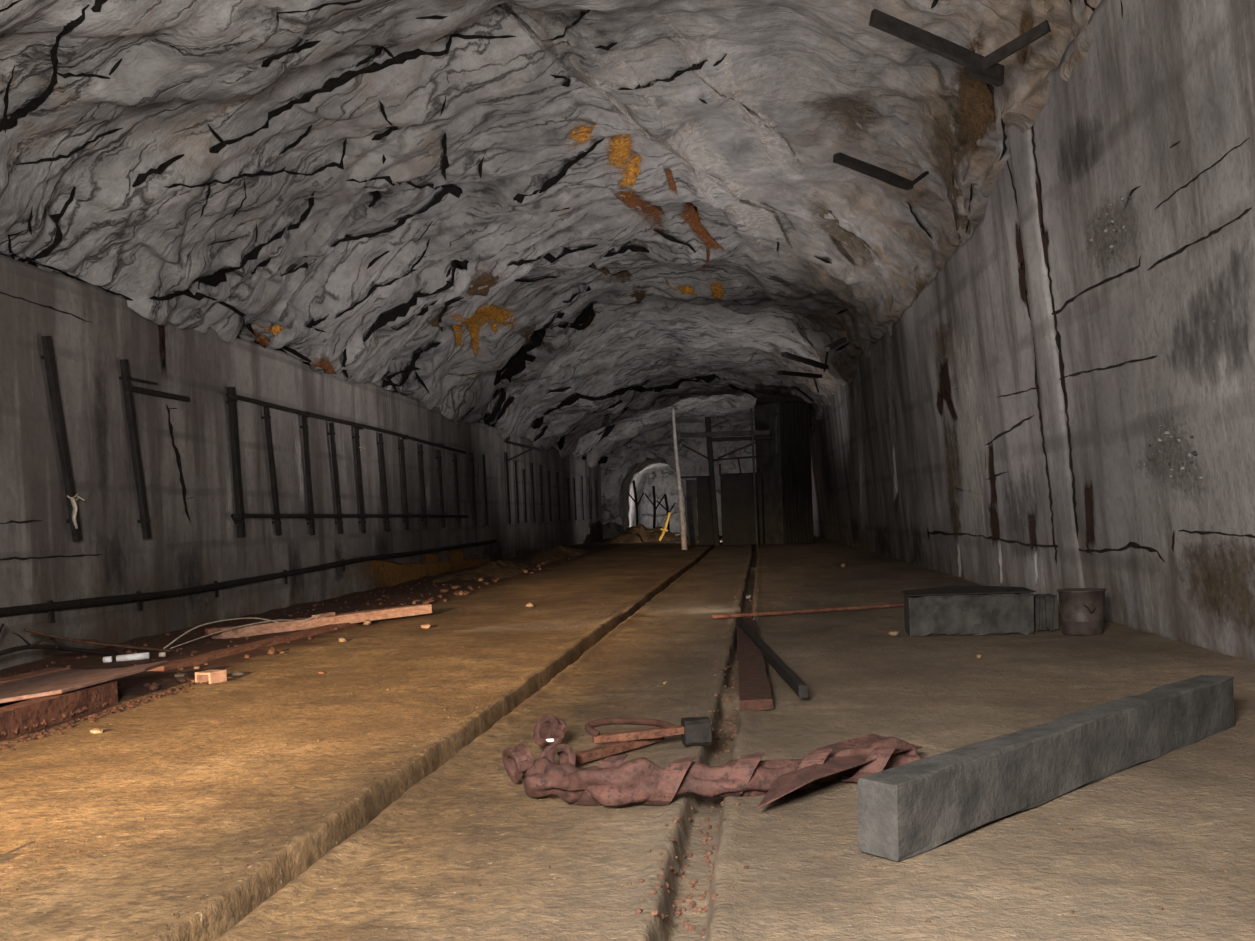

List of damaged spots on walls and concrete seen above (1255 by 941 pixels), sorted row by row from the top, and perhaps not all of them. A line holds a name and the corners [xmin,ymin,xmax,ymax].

rust [570,125,596,145]
rust [608,134,663,226]
crack [1006,124,1044,232]
crack [1123,137,1250,211]
rust [664,169,723,268]
crack [0,292,93,323]
rust [253,324,283,349]
rust [428,303,544,356]
rust [311,358,337,375]
crack [926,207,1255,564]
crack [0,518,42,526]
crack [0,553,101,561]